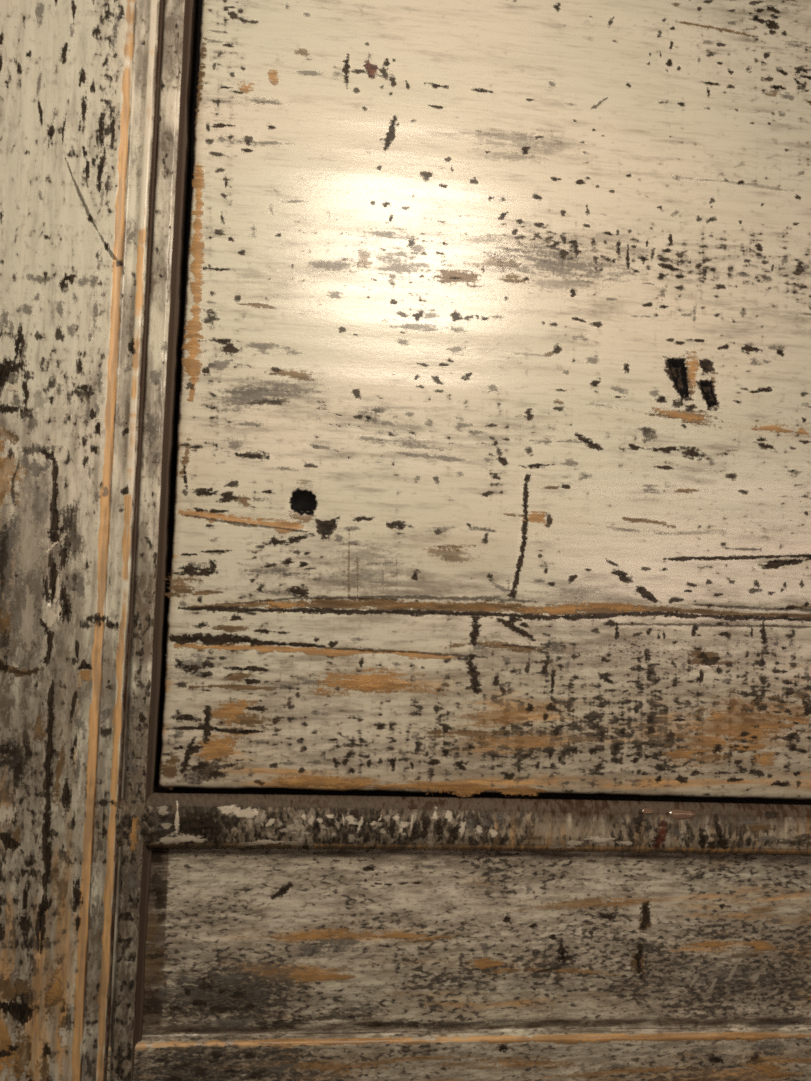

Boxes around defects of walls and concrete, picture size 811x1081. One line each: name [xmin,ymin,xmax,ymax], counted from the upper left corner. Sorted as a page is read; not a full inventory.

spalling [488,197,546,239]
spalling [559,229,701,284]
spalling [47,358,102,476]
spalling [485,423,604,480]
spalling [629,338,723,470]
spalling [717,344,784,365]
peeling [52,640,92,812]
peeling [149,654,425,909]
spalling [301,807,503,843]
peeling [254,617,571,797]
peeling [520,620,811,787]
peeling [0,960,71,1081]